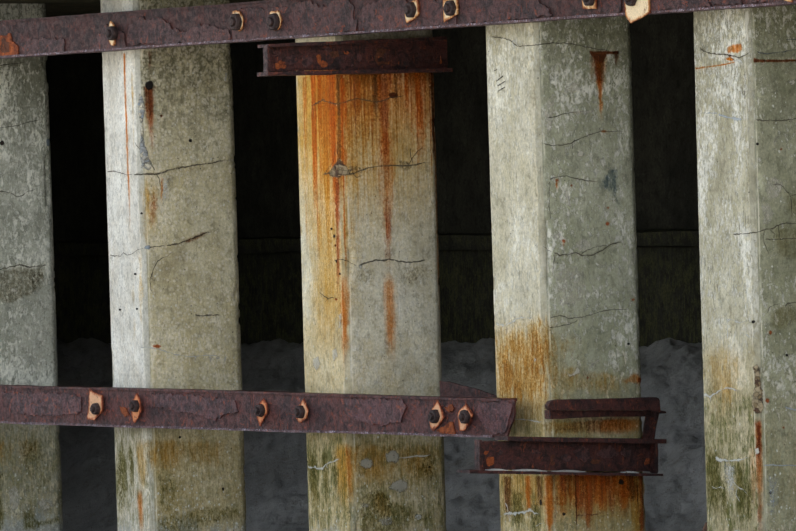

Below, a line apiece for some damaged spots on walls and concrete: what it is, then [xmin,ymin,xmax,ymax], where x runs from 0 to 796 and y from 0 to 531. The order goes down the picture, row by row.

rust [283,0,358,36]
rust [2,391,82,416]
rust [476,400,514,435]